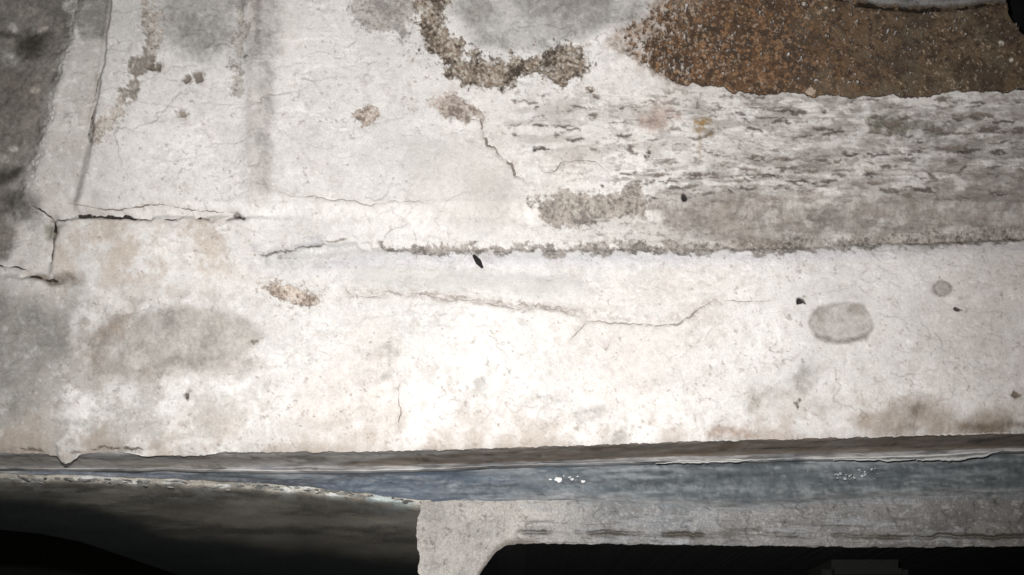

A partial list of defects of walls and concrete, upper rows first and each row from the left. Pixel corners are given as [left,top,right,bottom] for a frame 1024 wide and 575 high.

damp [0,0,109,259]
crack [455,113,516,177]
spalling [347,0,1024,259]
damp [868,113,941,136]
crack [0,204,244,282]
damp [91,308,257,373]
spalling [258,278,320,306]
crack [350,290,749,340]